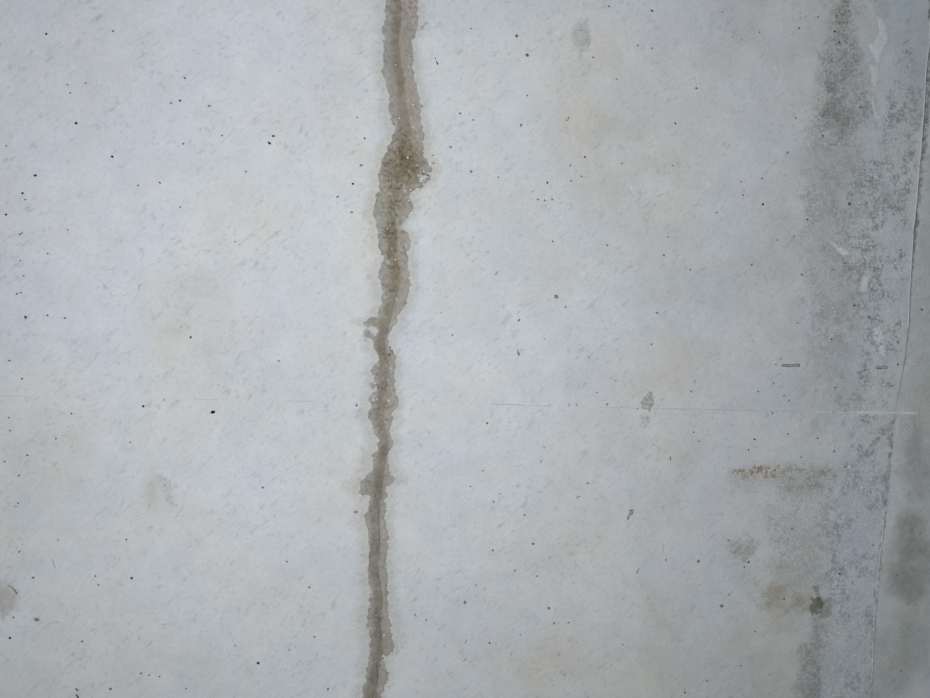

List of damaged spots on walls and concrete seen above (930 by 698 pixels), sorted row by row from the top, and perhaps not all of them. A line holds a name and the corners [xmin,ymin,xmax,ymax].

water stain [353,0,437,698]